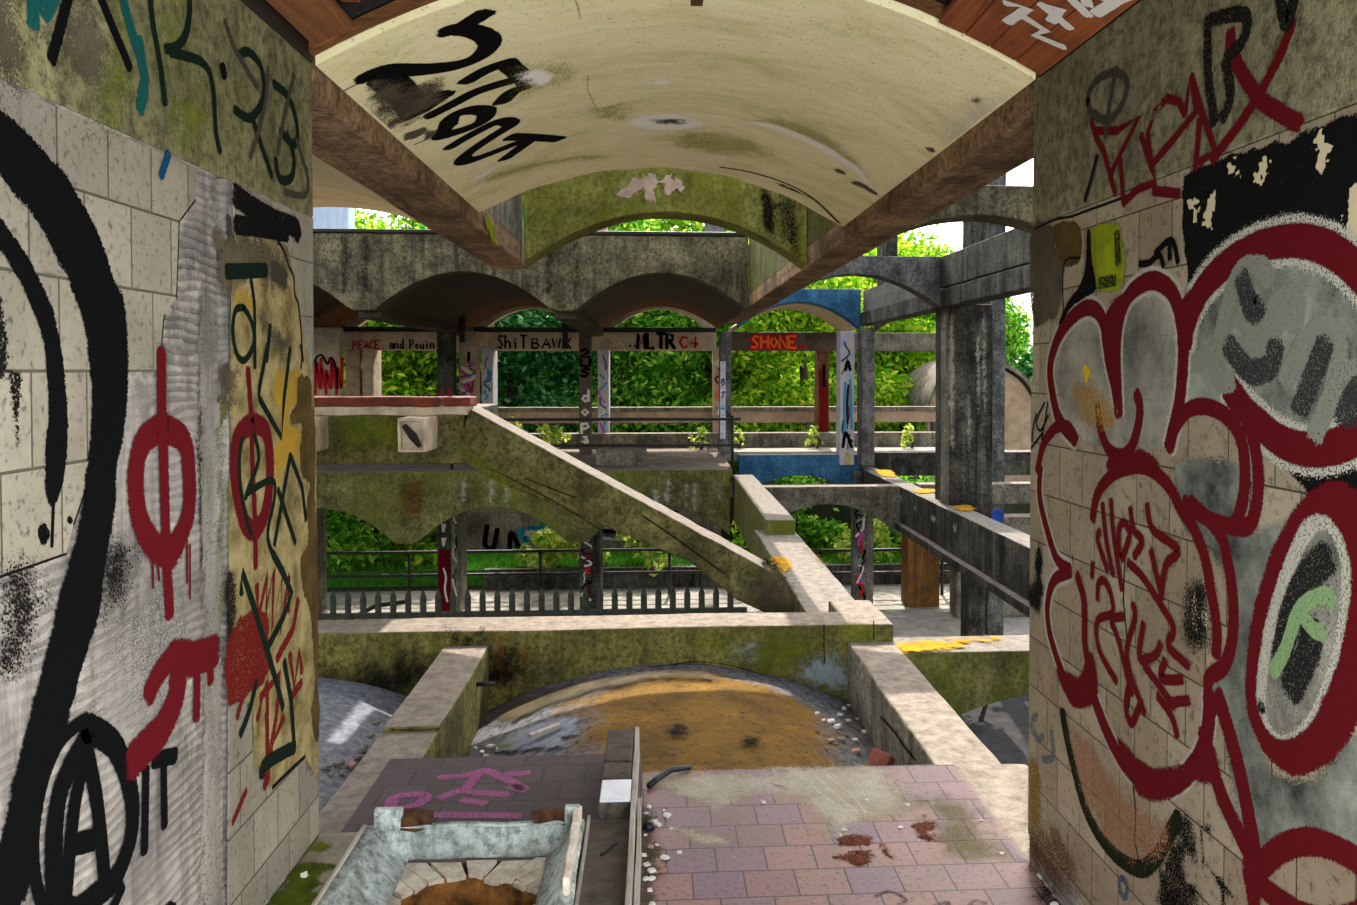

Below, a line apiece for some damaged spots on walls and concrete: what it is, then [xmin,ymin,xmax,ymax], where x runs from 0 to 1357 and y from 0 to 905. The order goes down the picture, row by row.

damp [0,0,117,123]
peeling [176,200,196,299]
peeling [617,173,685,203]
damp [760,189,805,260]
peeling [1181,113,1357,289]
peeling [1262,444,1357,492]
peeling [0,531,67,689]
flaking render [76,227,320,905]
damp [318,613,726,726]
damp [789,648,848,697]